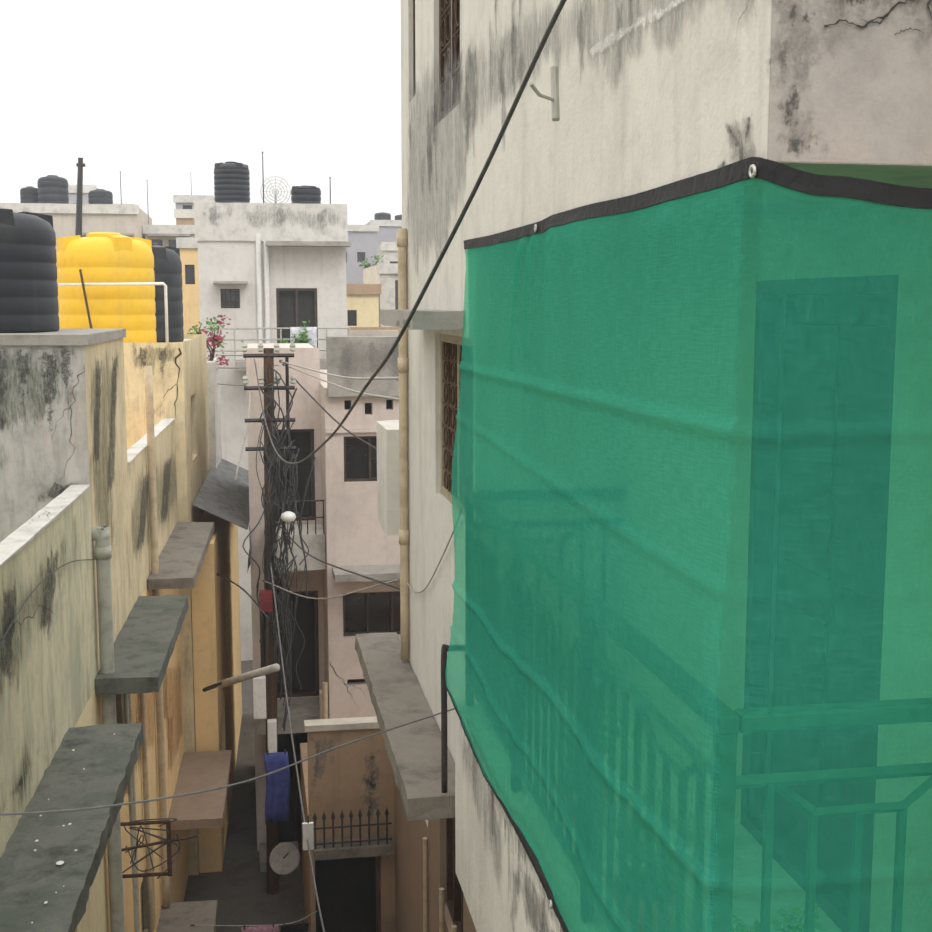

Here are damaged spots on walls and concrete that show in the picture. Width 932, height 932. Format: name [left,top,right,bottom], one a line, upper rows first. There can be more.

damp [769,0,813,124]
crack [824,0,932,35]
damp [408,6,561,258]
damp [0,350,70,428]
damp [92,356,117,544]
damp [132,459,176,548]
damp [0,548,66,685]